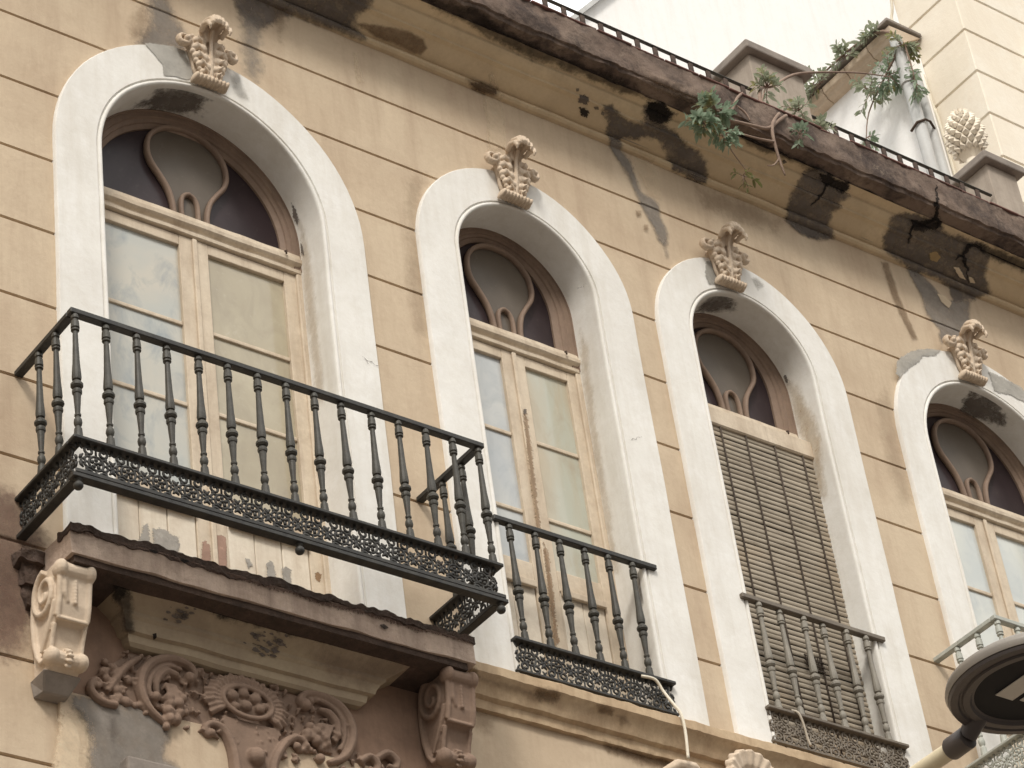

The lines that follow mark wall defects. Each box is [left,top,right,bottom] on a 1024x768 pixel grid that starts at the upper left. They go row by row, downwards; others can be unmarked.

peeling [145,43,192,80]
damp [236,0,426,72]
damp [430,0,639,94]
damp [137,89,208,113]
damp [604,101,708,243]
damp [743,135,850,240]
damp [883,185,1024,342]
peeling [896,348,940,377]
damp [960,391,1006,426]
peeling [988,372,1024,401]
spalling [57,521,476,646]